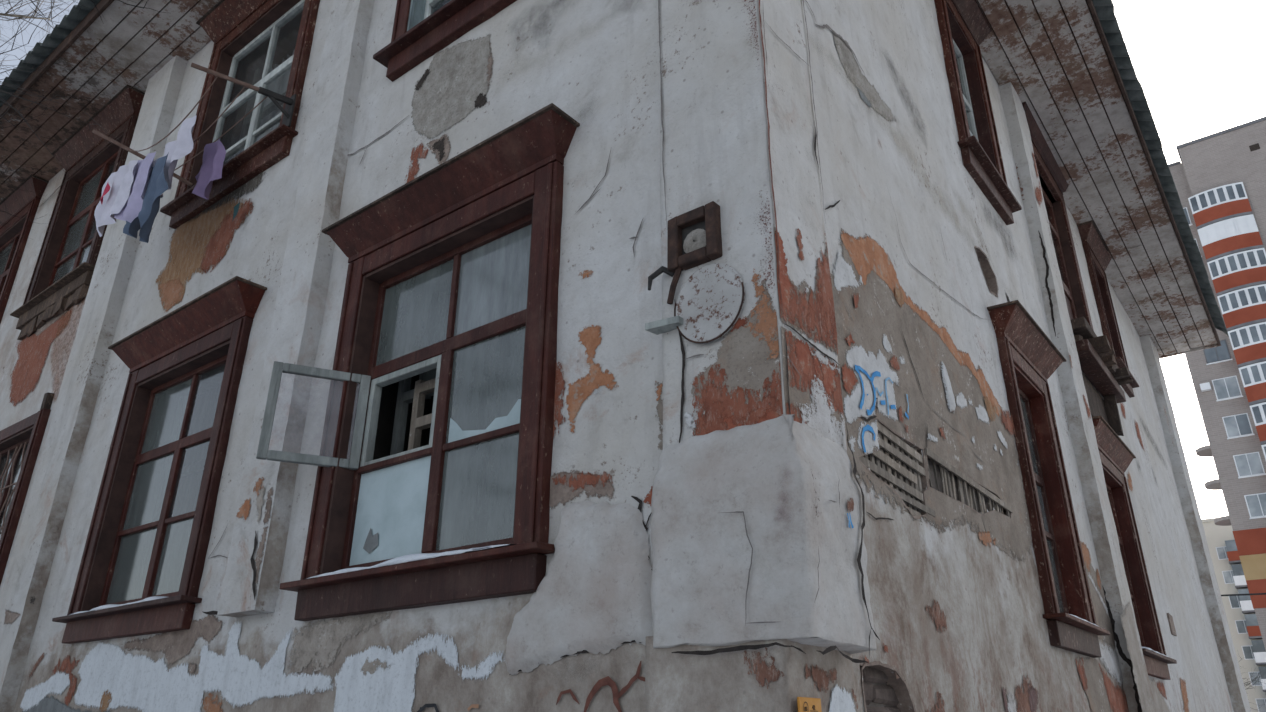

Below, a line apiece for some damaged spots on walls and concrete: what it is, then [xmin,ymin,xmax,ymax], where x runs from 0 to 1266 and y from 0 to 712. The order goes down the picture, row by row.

spalling [405,34,494,184]
spalling [816,24,897,122]
peeling [9,309,72,406]
peeling [156,172,268,312]
peeling [553,325,619,437]
crack [671,0,880,663]
peeling [684,227,1034,563]
crack [889,194,982,319]
crack [1038,230,1056,337]
peeling [19,611,505,712]
spalling [805,643,945,712]
crack [1103,587,1142,712]